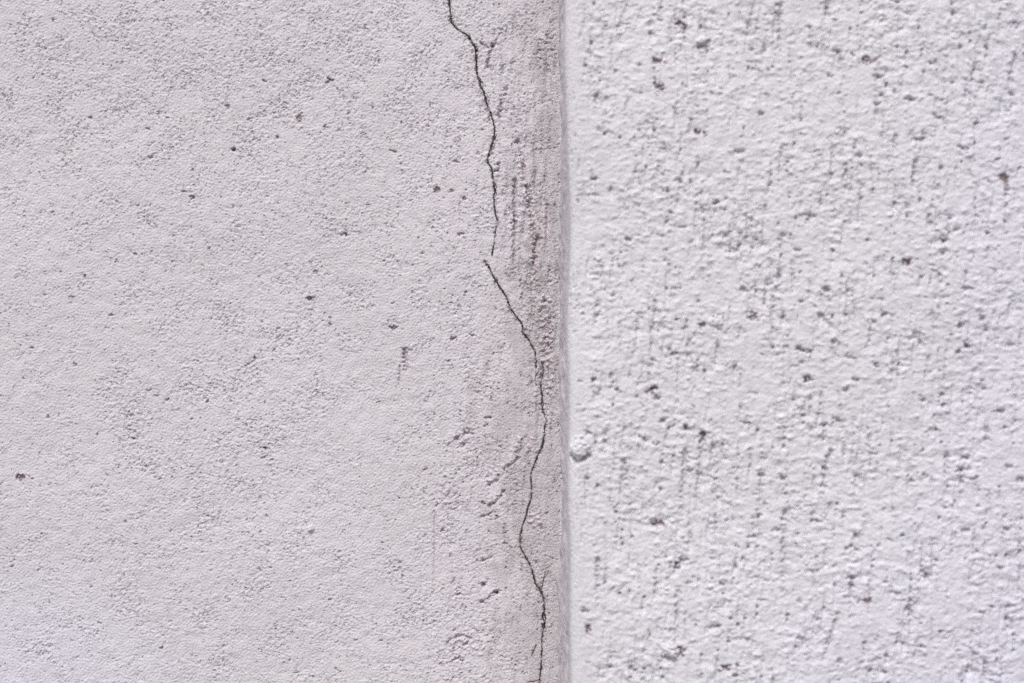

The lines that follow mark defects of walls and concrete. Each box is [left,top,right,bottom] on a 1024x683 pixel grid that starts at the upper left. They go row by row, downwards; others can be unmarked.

crack [448,0,547,682]